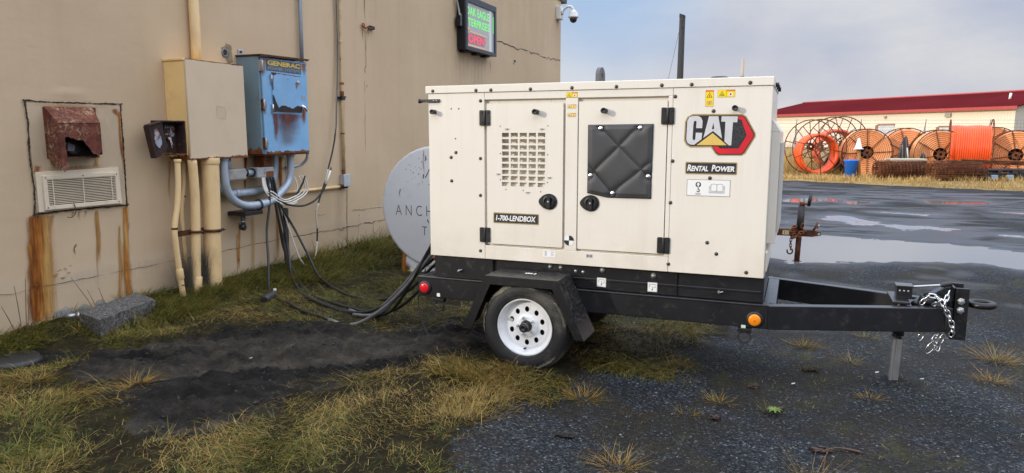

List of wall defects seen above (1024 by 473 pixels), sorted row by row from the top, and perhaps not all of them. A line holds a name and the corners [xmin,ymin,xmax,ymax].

crack [497,41,560,61]
corrosion [29,216,71,322]
corrosion [118,207,131,298]